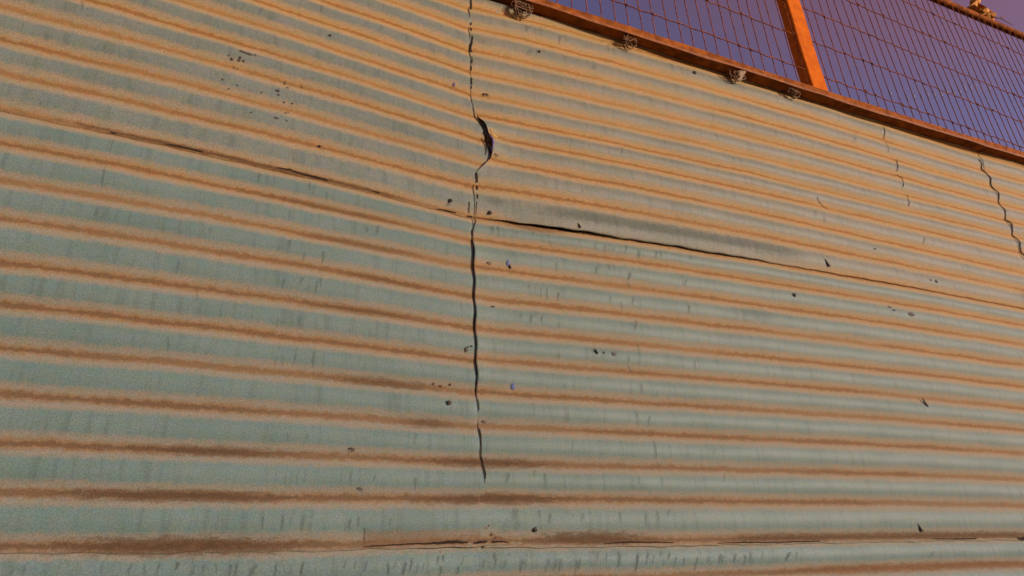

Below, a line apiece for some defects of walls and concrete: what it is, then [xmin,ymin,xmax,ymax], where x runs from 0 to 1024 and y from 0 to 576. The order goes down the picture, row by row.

crack [277,167,328,181]
crack [437,0,492,326]
crack [980,161,1024,255]
crack [522,223,757,260]
crack [475,353,486,479]
crack [364,528,508,547]
crack [603,538,674,546]
crack [719,538,820,546]